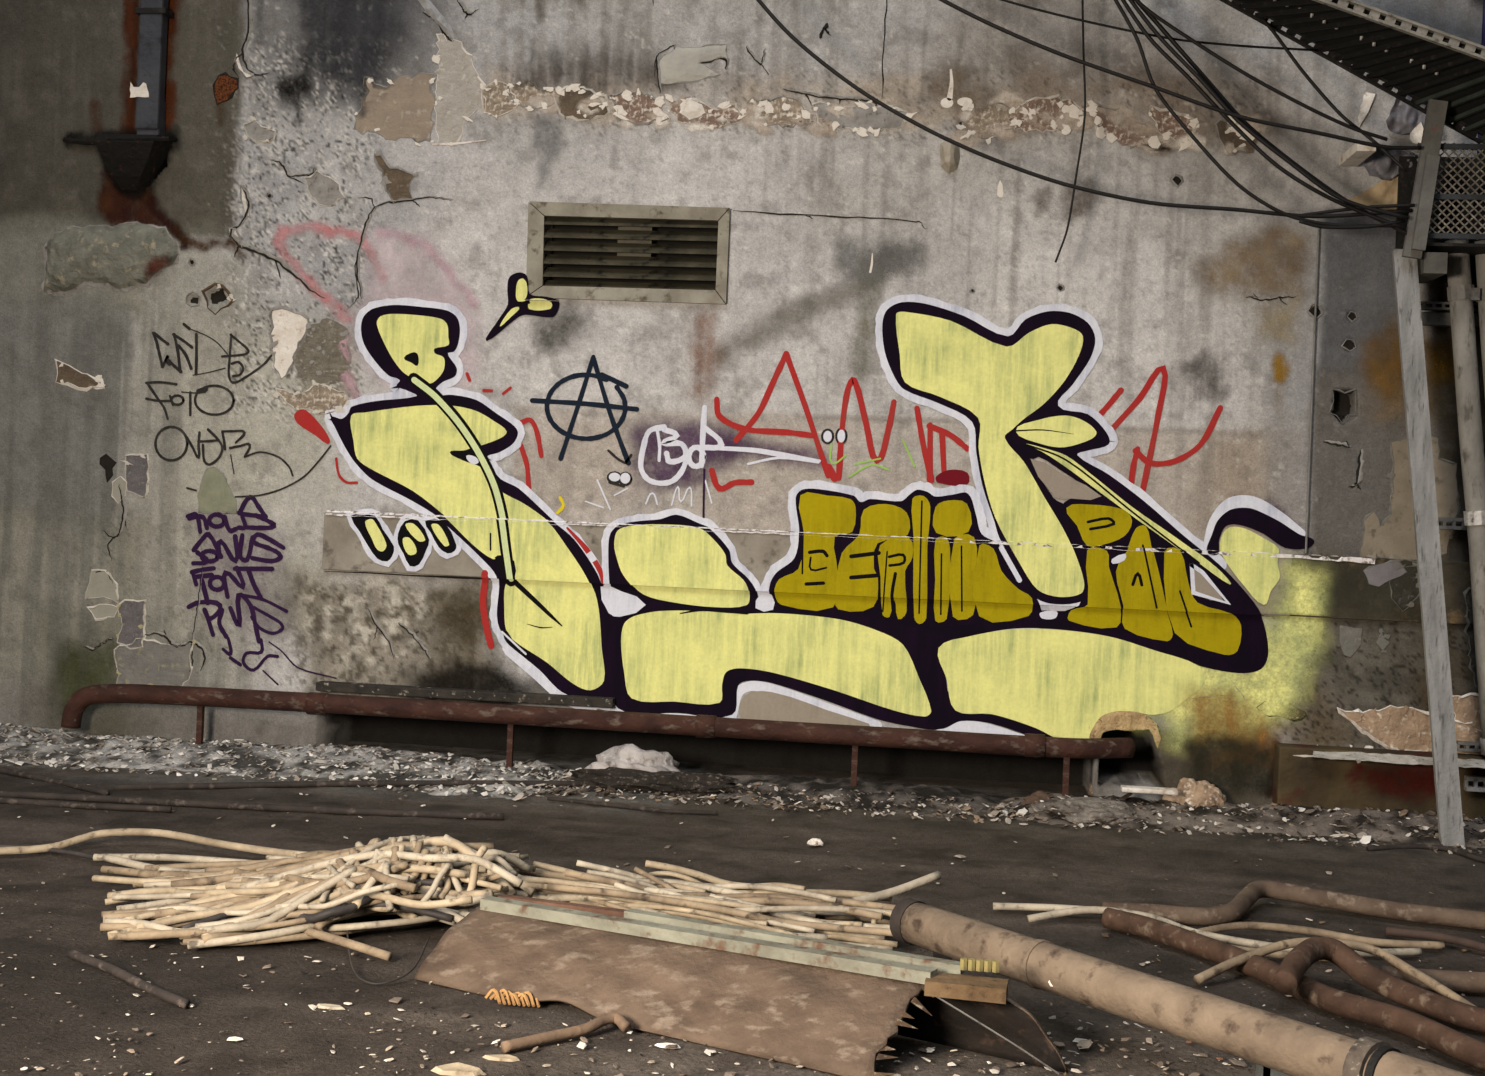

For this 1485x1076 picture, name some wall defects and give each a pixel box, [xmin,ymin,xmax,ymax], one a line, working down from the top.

rust [123,0,139,131]
rust [165,0,177,129]
crack [232,0,270,78]
crack [423,0,478,42]
flaking render [353,33,919,204]
crack [271,159,316,184]
crack [229,185,453,309]
flaking render [54,359,105,392]
peeling [99,453,150,503]
peeling [85,569,196,686]
spalling [1089,709,1161,748]
flaking render [1293,705,1433,765]